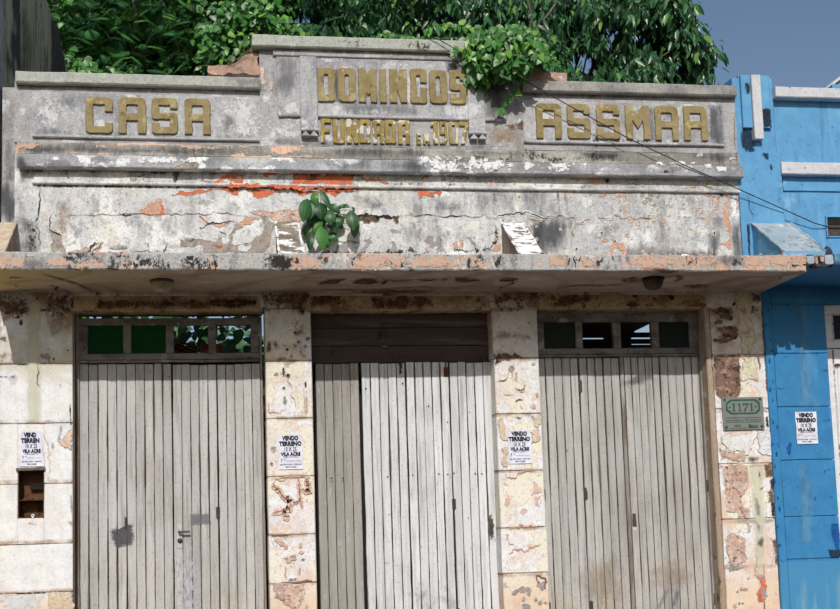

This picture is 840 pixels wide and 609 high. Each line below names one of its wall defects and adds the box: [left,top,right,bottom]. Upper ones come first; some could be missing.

leakage [6,0,34,78]
leakage [45,14,66,72]
crack [35,192,263,251]
peeling [92,144,740,270]
crack [404,210,655,236]
leakage [534,223,565,250]
leakage [494,292,539,311]
leakage [493,353,521,364]
flaking render [710,292,773,399]
flaking render [719,420,792,572]
flaking render [512,575,548,609]
flaking render [733,574,768,609]